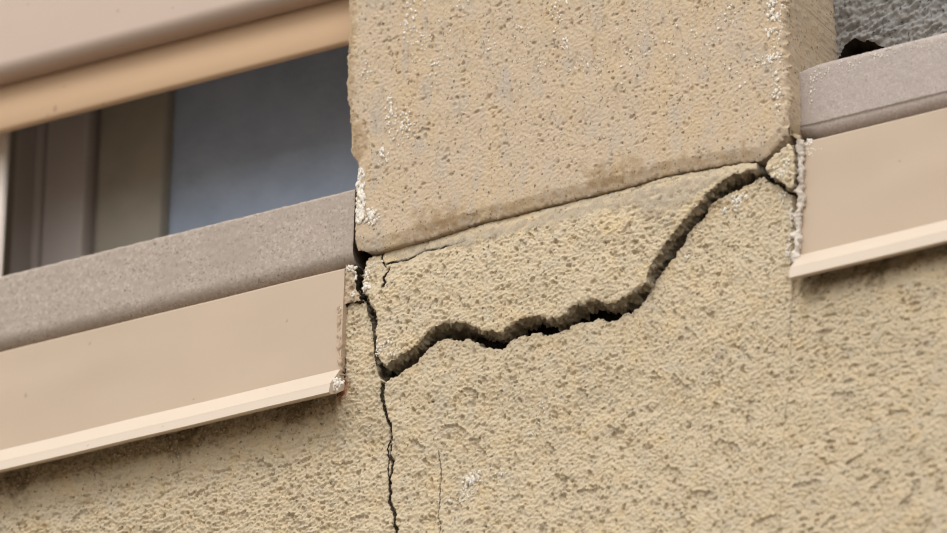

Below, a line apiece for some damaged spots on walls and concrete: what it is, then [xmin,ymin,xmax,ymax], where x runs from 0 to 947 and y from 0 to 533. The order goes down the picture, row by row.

crack [748,175,796,195]
crack [381,240,466,287]
crack [462,310,632,350]
crack [379,371,398,533]